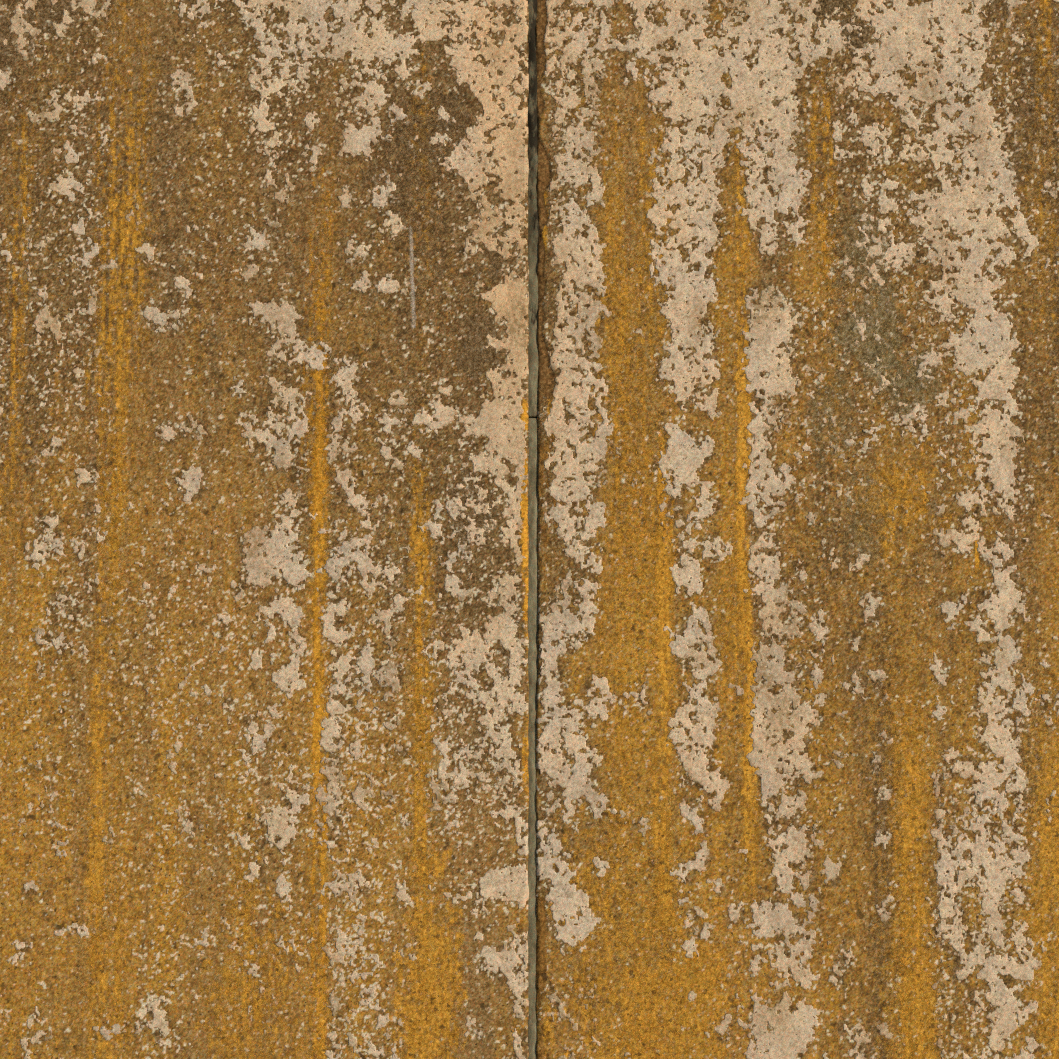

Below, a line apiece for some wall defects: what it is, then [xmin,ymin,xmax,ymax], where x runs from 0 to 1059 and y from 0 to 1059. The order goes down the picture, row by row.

leakage [0,0,82,80]
leakage [813,0,869,58]
leakage [362,81,484,274]
leakage [476,236,506,280]
leakage [456,307,504,390]
leakage [828,215,936,415]
leakage [448,471,497,551]
leakage [861,703,893,1002]